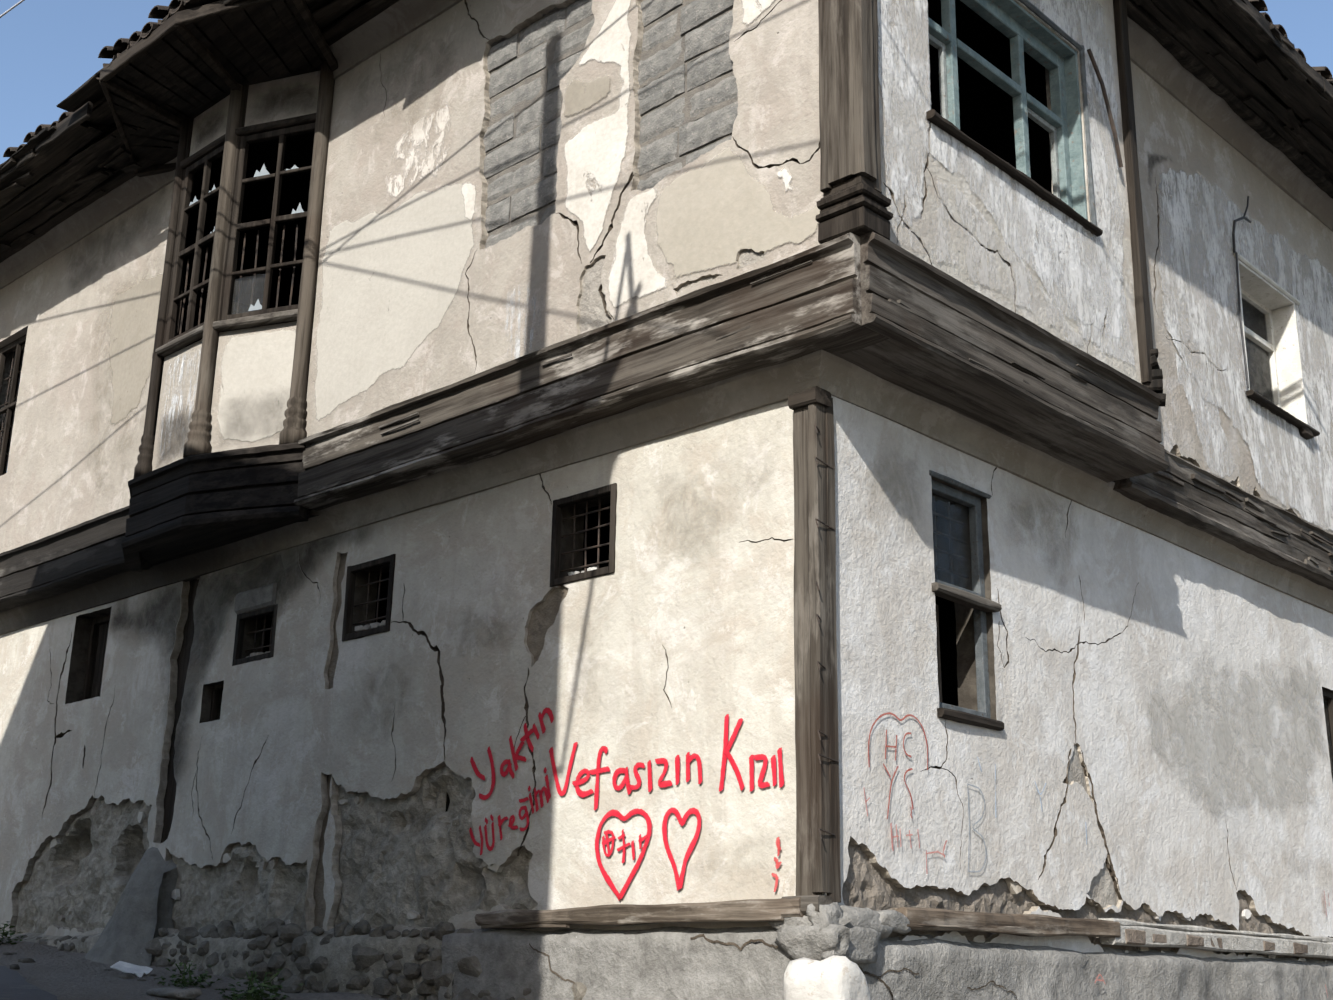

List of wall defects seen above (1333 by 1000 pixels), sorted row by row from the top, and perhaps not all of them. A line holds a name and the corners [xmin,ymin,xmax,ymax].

peeling [565,0,820,335]
crack [883,123,1016,313]
peeling [1158,168,1333,530]
spalling [9,581,538,934]
crack [389,707,397,780]
crack [393,586,446,760]
crack [514,668,536,856]
flaking render [524,586,569,667]
crack [997,577,1137,902]
spalling [842,836,1309,937]
spalling [1088,937,1180,954]
spalling [1213,951,1333,962]